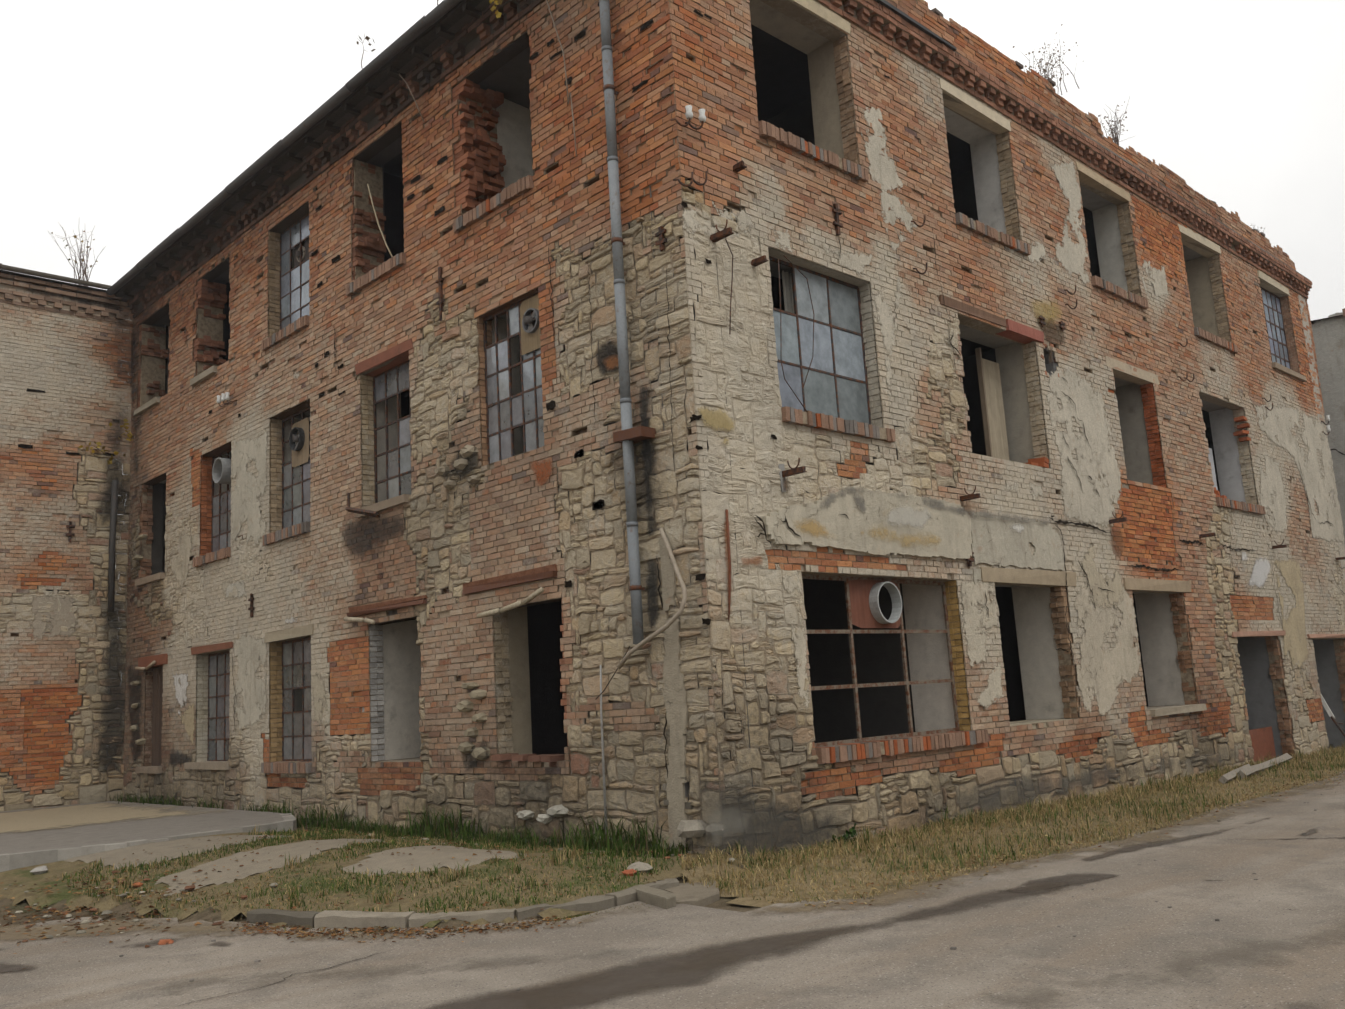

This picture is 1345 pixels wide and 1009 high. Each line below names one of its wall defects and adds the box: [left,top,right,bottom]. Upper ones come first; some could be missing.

peeling [879,189,918,251]
hole [1040,342,1059,377]
leakage [98,334,141,522]
peeling [1260,457,1287,533]
leakage [344,516,403,555]
spalling [765,547,906,573]
leakage [96,609,141,771]